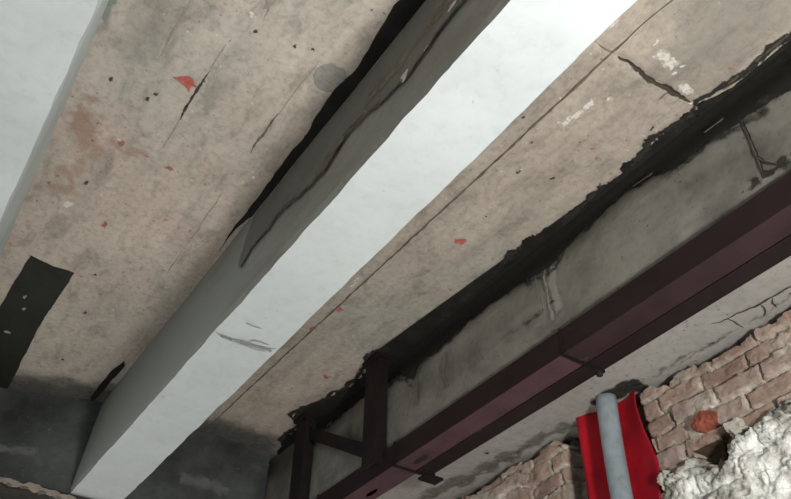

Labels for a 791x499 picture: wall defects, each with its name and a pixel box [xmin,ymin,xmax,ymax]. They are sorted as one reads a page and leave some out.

crack [163,44,226,147]
water stain [314,64,346,92]
peeling [239,0,466,267]
crack [207,0,690,429]
crack [712,286,791,327]
spalling [590,379,649,405]
peeling [663,399,791,499]